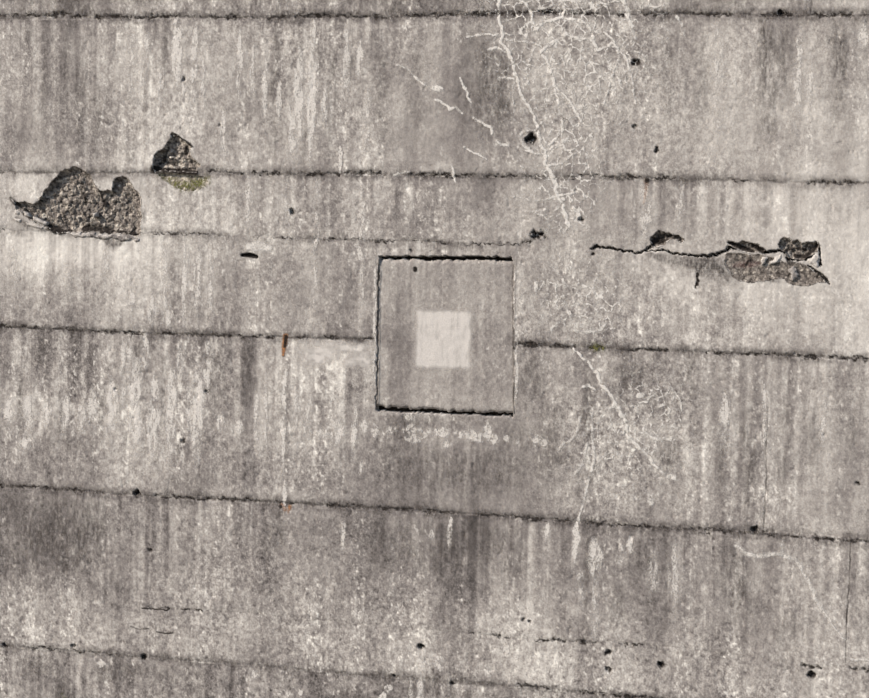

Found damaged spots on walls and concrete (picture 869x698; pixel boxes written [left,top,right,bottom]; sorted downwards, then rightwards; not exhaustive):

crack [0,11,182,21]
damp [156,18,205,110]
damp [235,24,328,161]
spalling [9,166,142,246]
spalling [150,132,210,192]
damp [2,234,217,464]
crack [0,324,273,339]
crack [200,0,869,640]
damp [279,362,519,468]
crack [155,492,454,515]
damp [572,521,603,634]
crack [582,690,653,698]